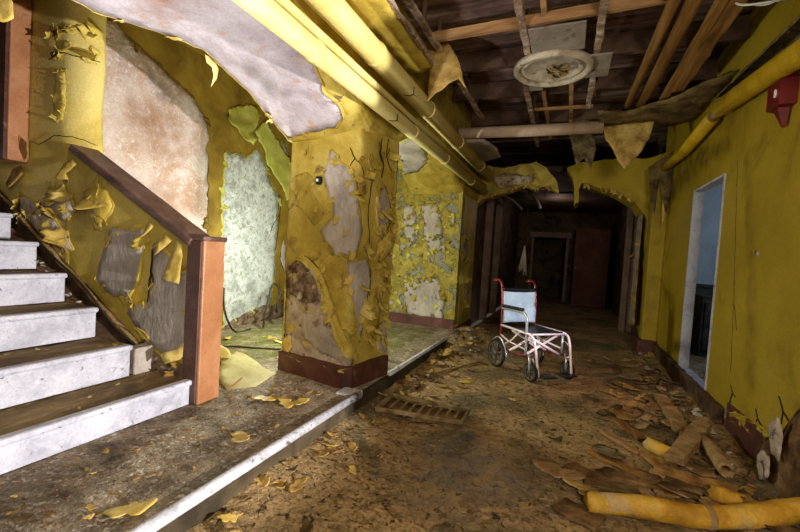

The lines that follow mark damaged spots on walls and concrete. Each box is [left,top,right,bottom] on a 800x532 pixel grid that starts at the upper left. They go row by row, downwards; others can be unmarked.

flaking render [44,0,472,373]
crack [350,114,399,244]
flaking render [484,173,550,199]
flaking render [6,135,187,378]
crack [755,396,789,426]